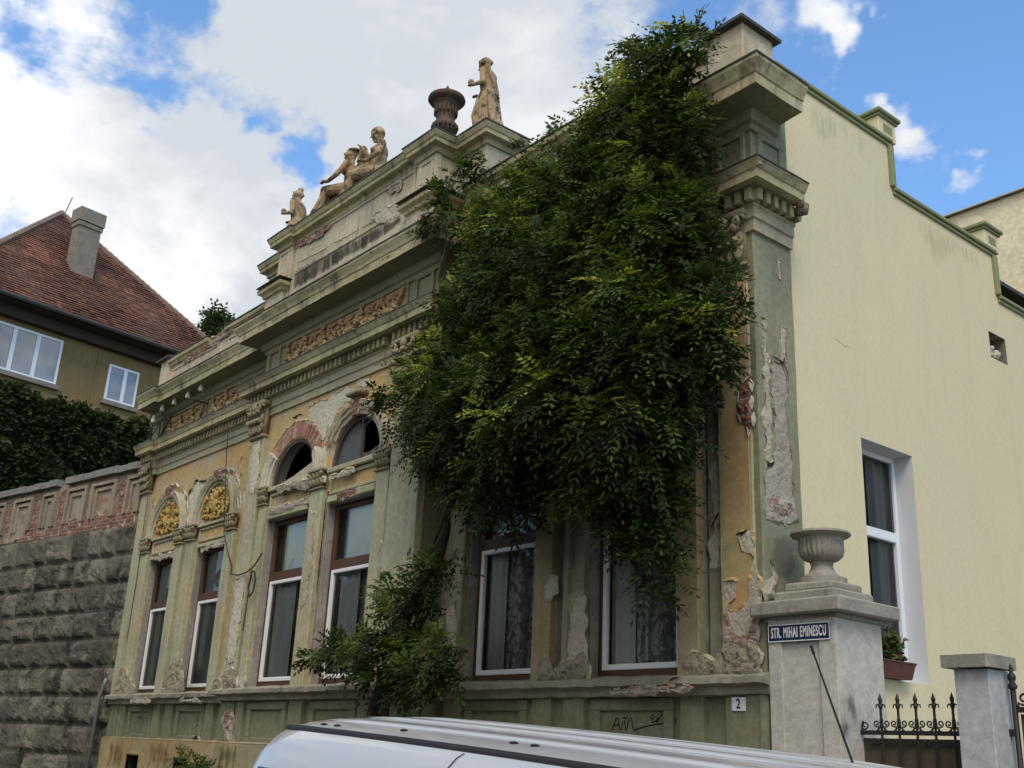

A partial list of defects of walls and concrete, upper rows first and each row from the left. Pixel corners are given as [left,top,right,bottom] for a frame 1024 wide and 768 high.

spalling [736,318,799,527]
peeling [268,376,371,610]
peeling [212,577,247,689]
peeling [543,574,559,602]
spalling [537,595,592,681]
spalling [609,455,779,697]
flaking render [221,709,236,742]